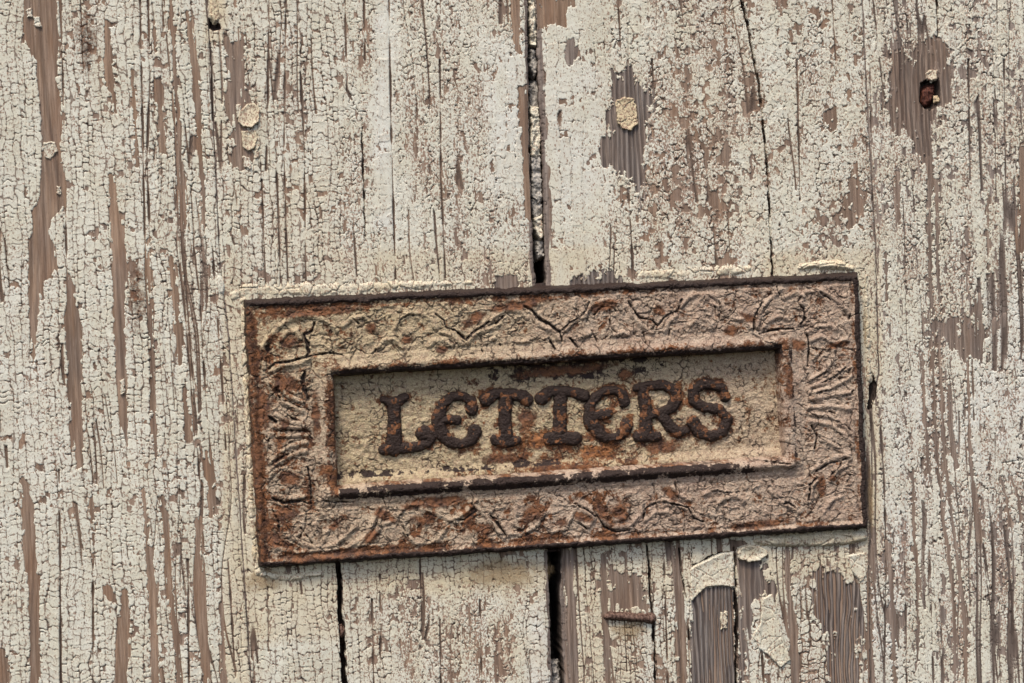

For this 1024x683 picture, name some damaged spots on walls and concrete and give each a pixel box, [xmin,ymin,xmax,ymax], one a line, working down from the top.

peeling [599,62,658,212]
crack [740,2,773,275]
peeling [22,0,85,471]
corrosion [588,299,623,313]
corrosion [724,313,755,336]
peeling [882,33,1007,683]
peeling [20,477,42,683]
crack [336,564,348,683]
corrosion [251,372,463,564]
corrosion [483,409,552,464]
peeling [671,542,802,683]
corrosion [730,517,790,530]